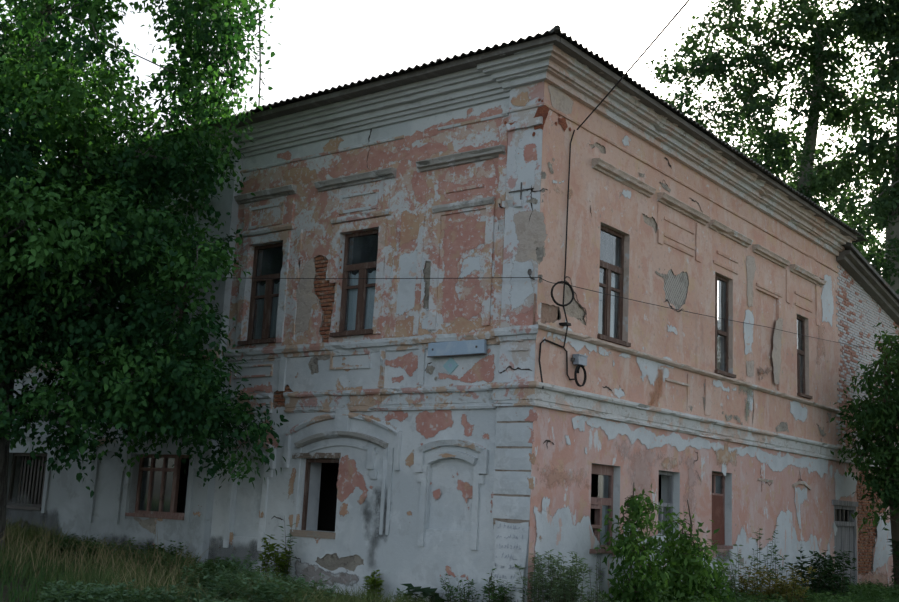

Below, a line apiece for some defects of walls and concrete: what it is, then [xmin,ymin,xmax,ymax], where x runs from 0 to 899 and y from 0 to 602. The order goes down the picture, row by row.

peeling [320,84,573,283]
flaking render [313,255,340,343]
flaking render [240,374,298,449]
peeling [308,348,495,466]
peeling [336,455,373,517]
peeling [452,473,473,510]
peeling [715,444,737,476]